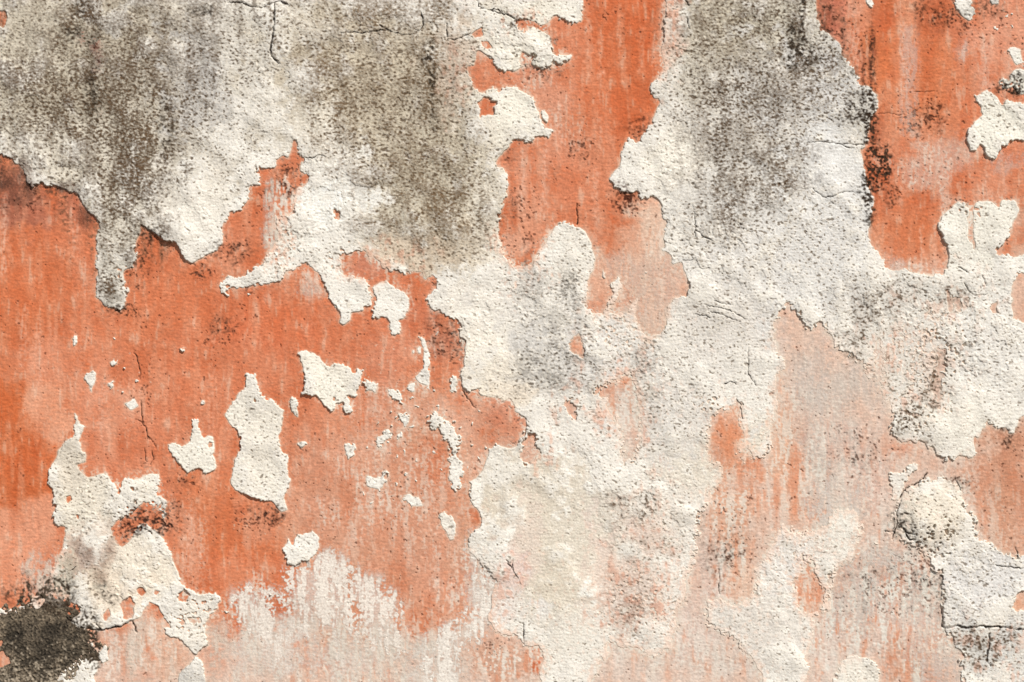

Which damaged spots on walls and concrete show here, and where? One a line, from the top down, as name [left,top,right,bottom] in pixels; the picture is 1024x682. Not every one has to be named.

damp [0,0,220,259]
crack [230,0,290,64]
flaking render [0,0,583,325]
damp [303,1,483,258]
damp [684,0,842,230]
damp [843,30,895,223]
flaking render [0,413,224,682]
peeling [229,531,409,680]
flaking render [225,336,435,512]
flaking render [405,0,1024,682]
crack [885,473,927,540]
crack [941,609,1024,666]